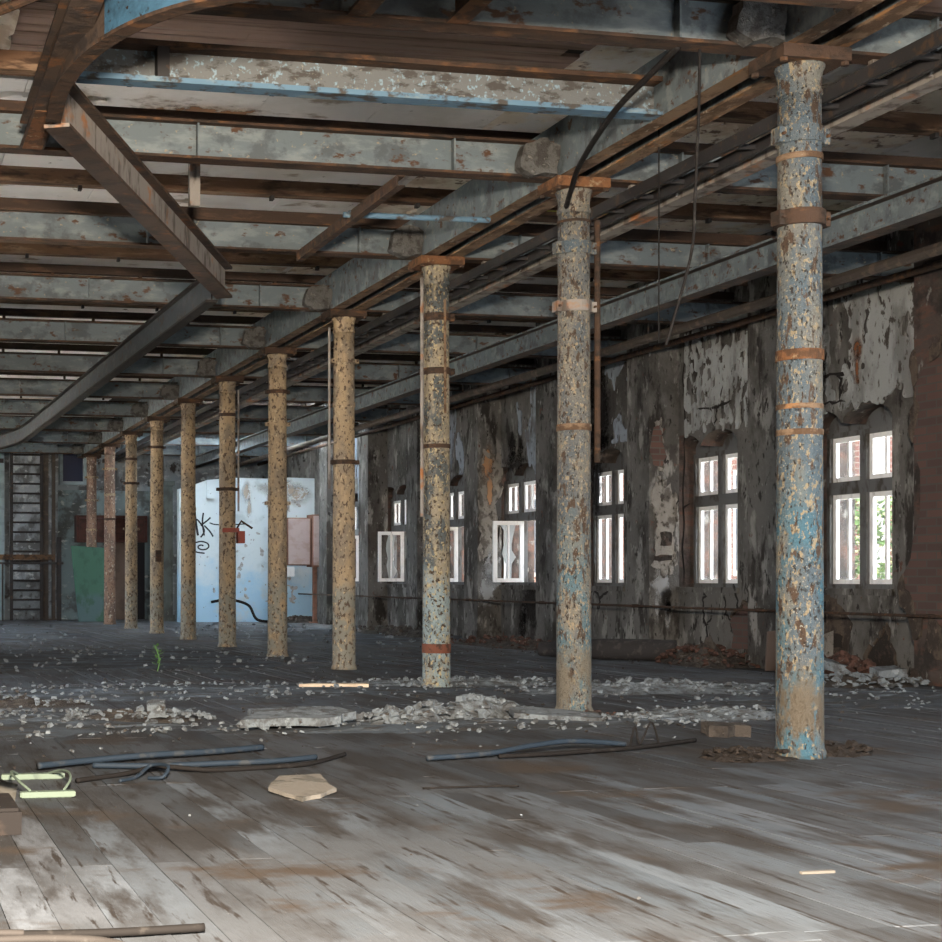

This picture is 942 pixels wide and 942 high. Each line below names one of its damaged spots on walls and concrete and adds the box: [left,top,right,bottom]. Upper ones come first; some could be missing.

peeling [684,326,748,438]
spalling [649,417,679,578]